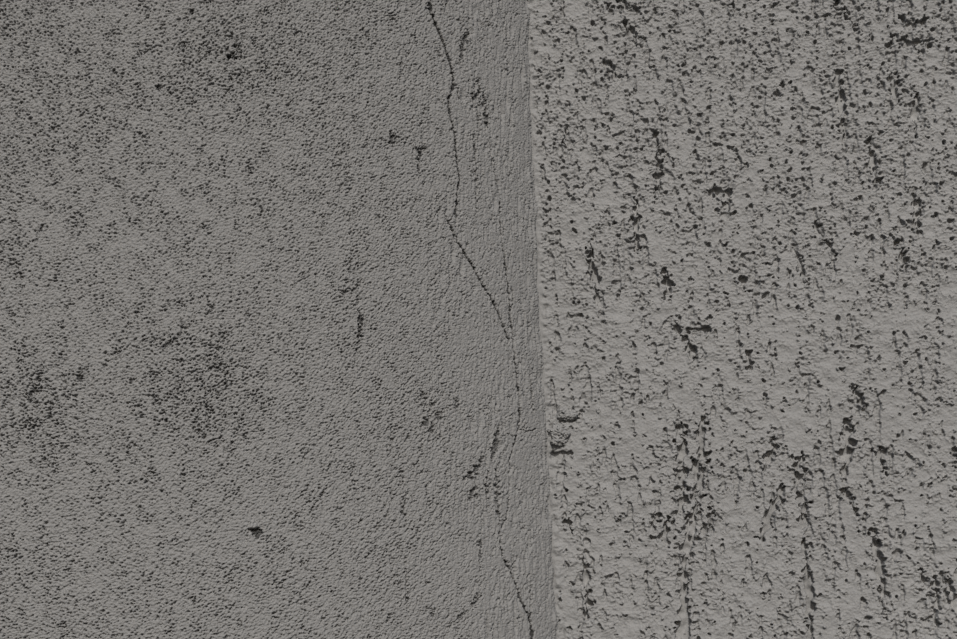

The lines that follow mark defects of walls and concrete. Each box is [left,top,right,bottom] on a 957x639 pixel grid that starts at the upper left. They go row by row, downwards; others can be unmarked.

crack [428,0,535,639]